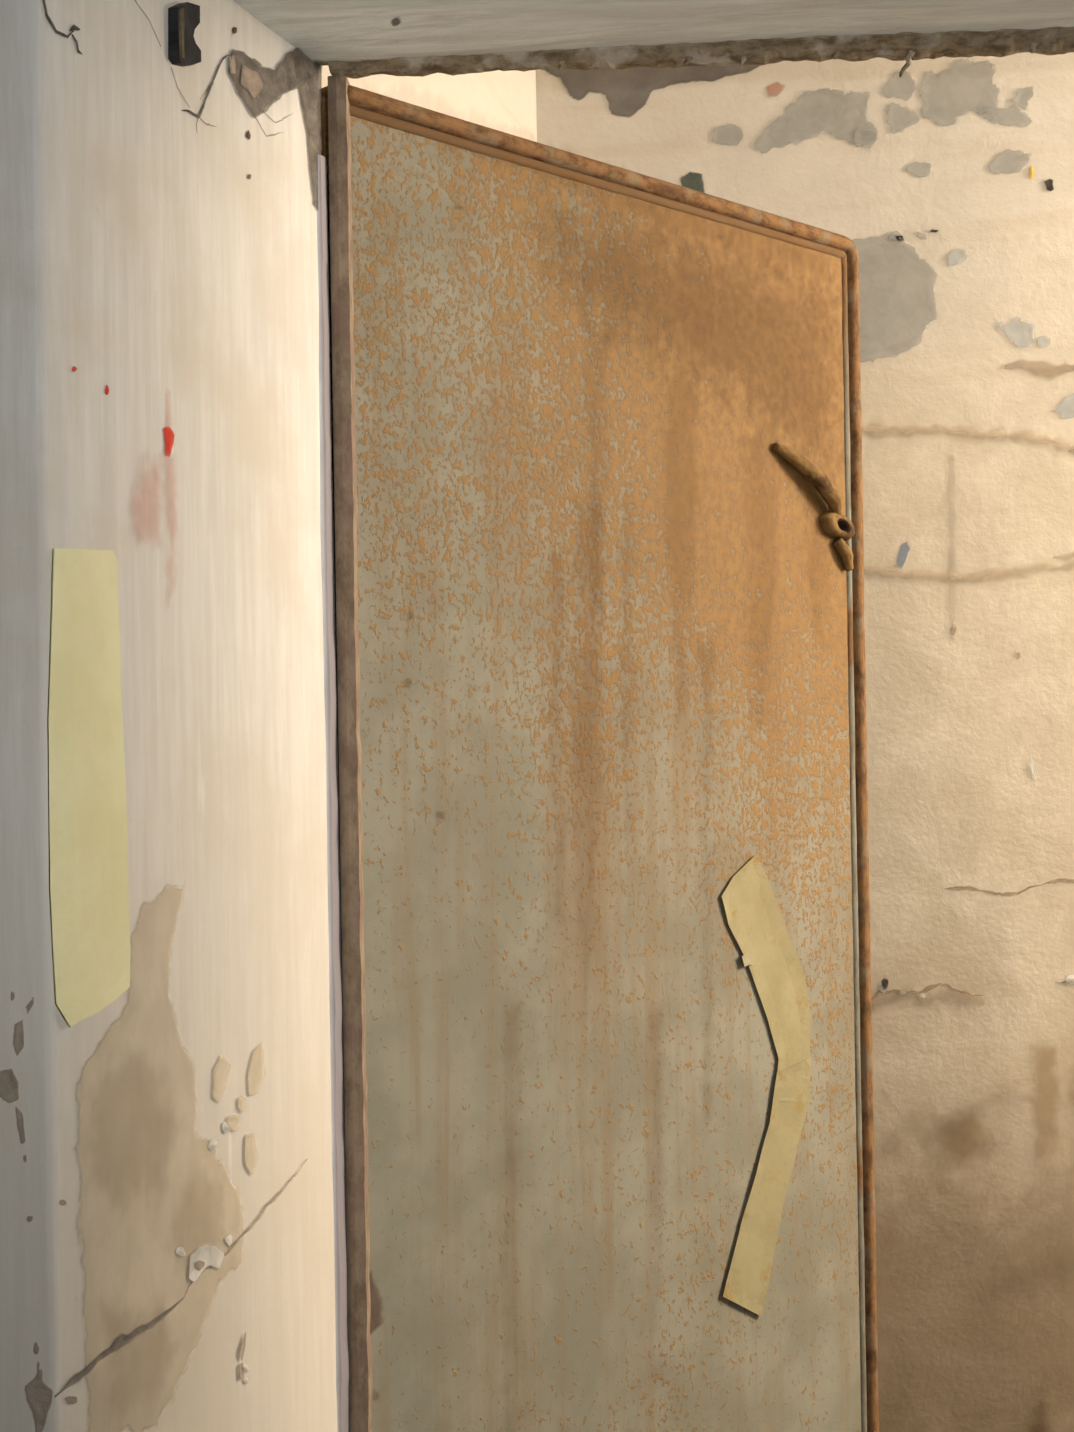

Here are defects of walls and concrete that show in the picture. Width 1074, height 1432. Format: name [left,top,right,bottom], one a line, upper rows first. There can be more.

crack [43,0,82,54]
crack [135,0,232,130]
flaking render [229,48,322,209]
peeling [713,50,1033,153]
peeling [907,162,931,177]
peeling [852,229,967,362]
crack [945,878,1074,896]
spalling [0,992,34,1161]
water stain [76,886,243,1432]
crack [55,1159,307,1397]
corrosion [369,1273,382,1334]
spalling [26,1343,77,1432]